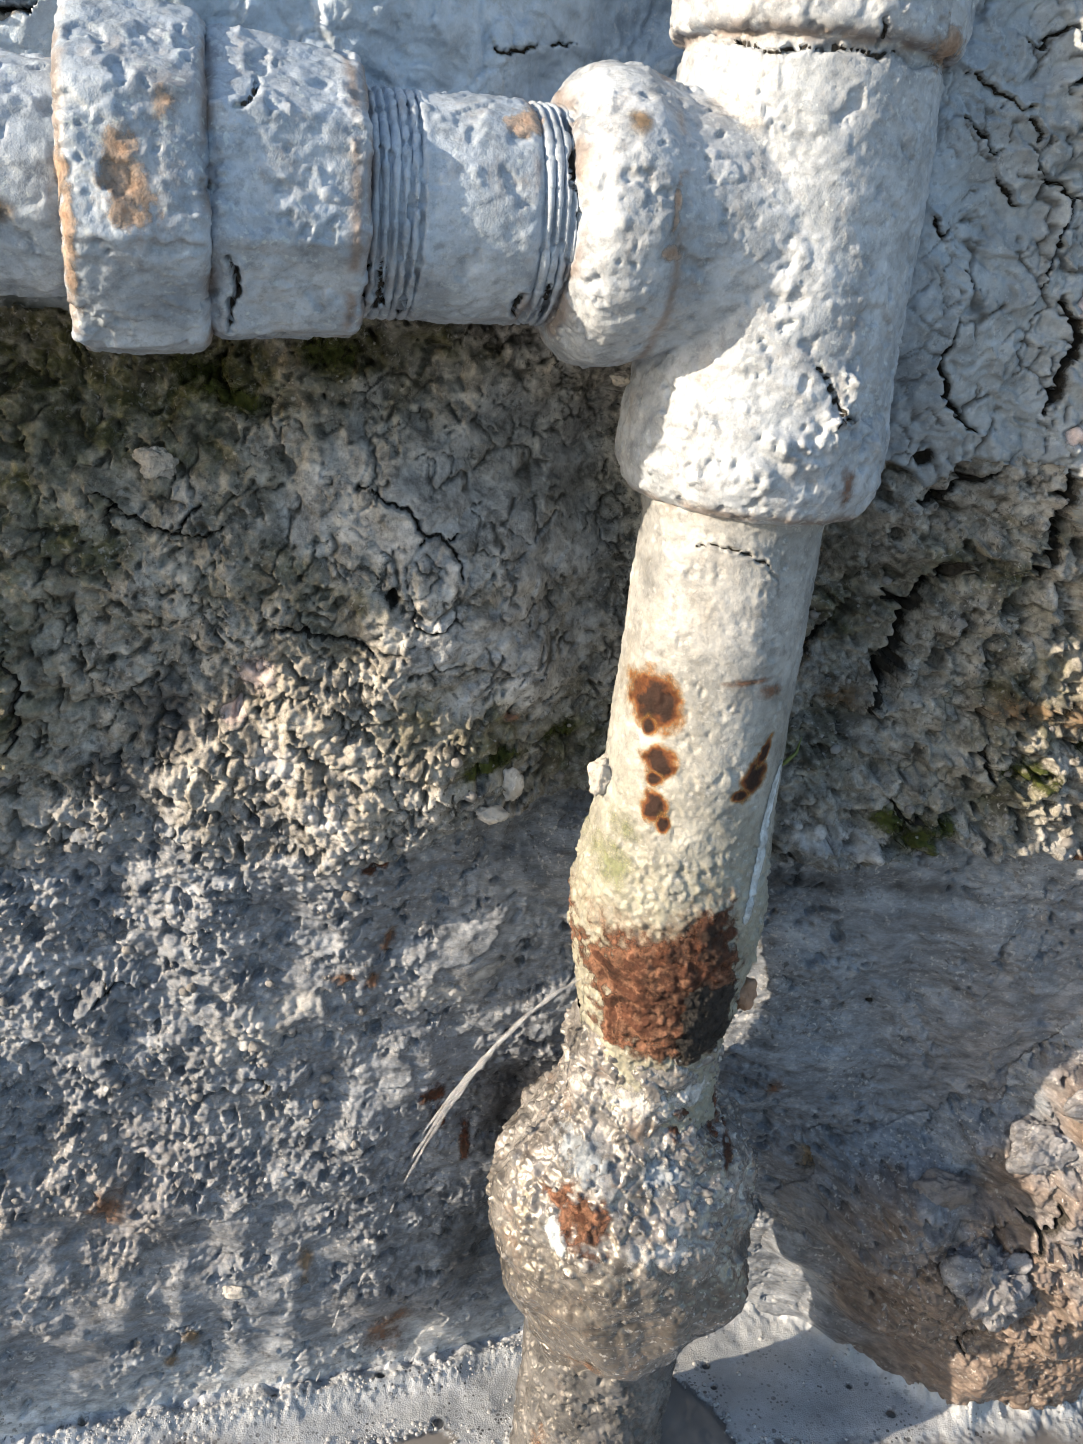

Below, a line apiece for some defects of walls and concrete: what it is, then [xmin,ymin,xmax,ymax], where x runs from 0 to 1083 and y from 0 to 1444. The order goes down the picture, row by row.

crack [964,72,1083,416]
crack [937,336,978,433]
crack [358,485,464,581]
crack [1032,469,1080,578]
peeling [221,656,276,729]
crack [867,565,943,716]
peeling [239,741,387,861]
rust [628,664,685,834]
rust [731,733,774,803]
peeling [784,817,885,866]
rust [568,880,744,1063]
rust [541,1182,611,1266]